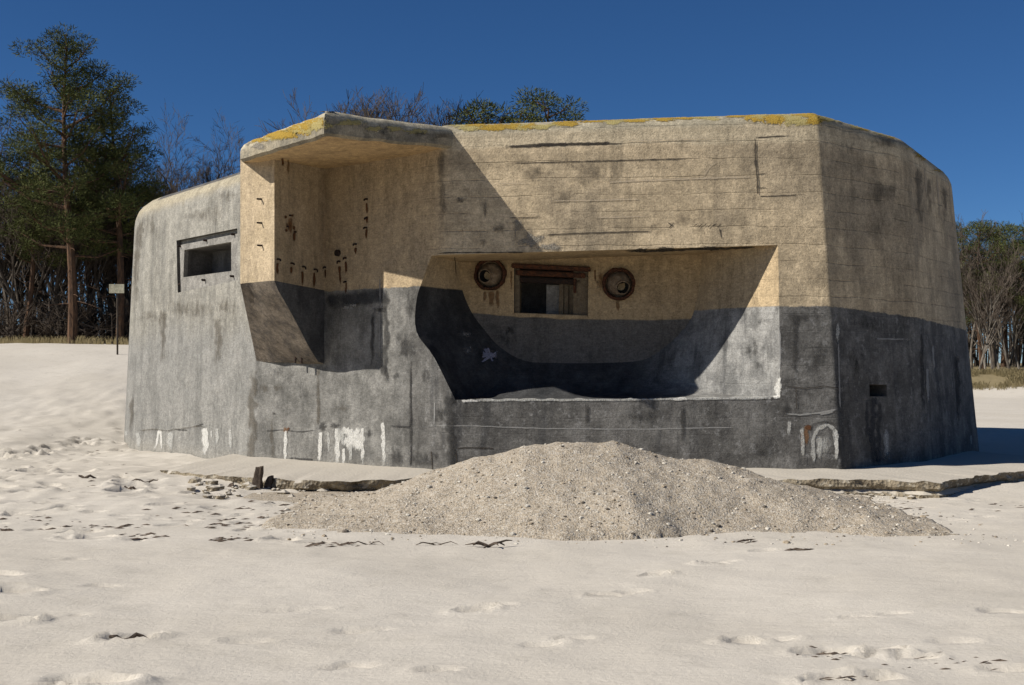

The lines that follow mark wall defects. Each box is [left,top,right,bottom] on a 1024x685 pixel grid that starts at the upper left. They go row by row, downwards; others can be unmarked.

crack [510,142,685,163]
crack [754,135,800,197]
corrosion [276,248,357,293]
water stain [156,424,232,454]